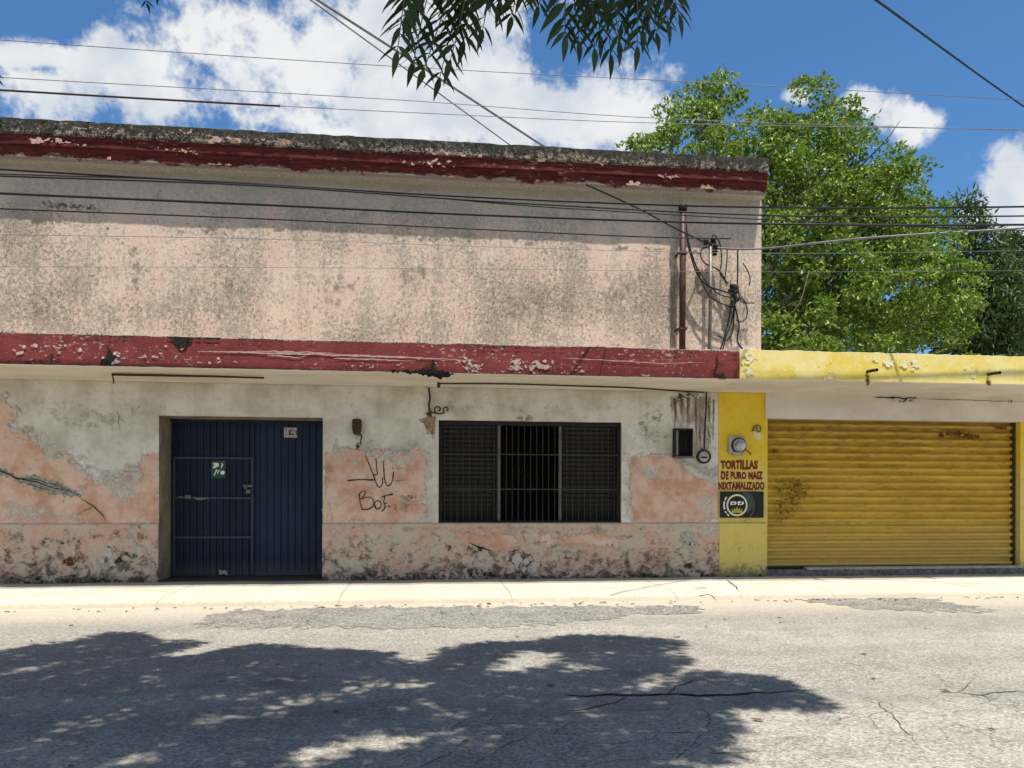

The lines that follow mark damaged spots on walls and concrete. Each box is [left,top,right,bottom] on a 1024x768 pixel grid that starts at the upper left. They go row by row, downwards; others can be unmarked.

peeling [30,124,110,146]
peeling [169,129,245,144]
peeling [391,147,482,168]
spalling [100,345,121,366]
spalling [135,336,222,368]
spalling [346,357,484,379]
peeling [494,355,585,374]
peeling [0,391,159,524]
peeling [322,416,436,523]
peeling [624,452,719,550]
crack [0,467,151,575]
water stain [339,548,714,580]